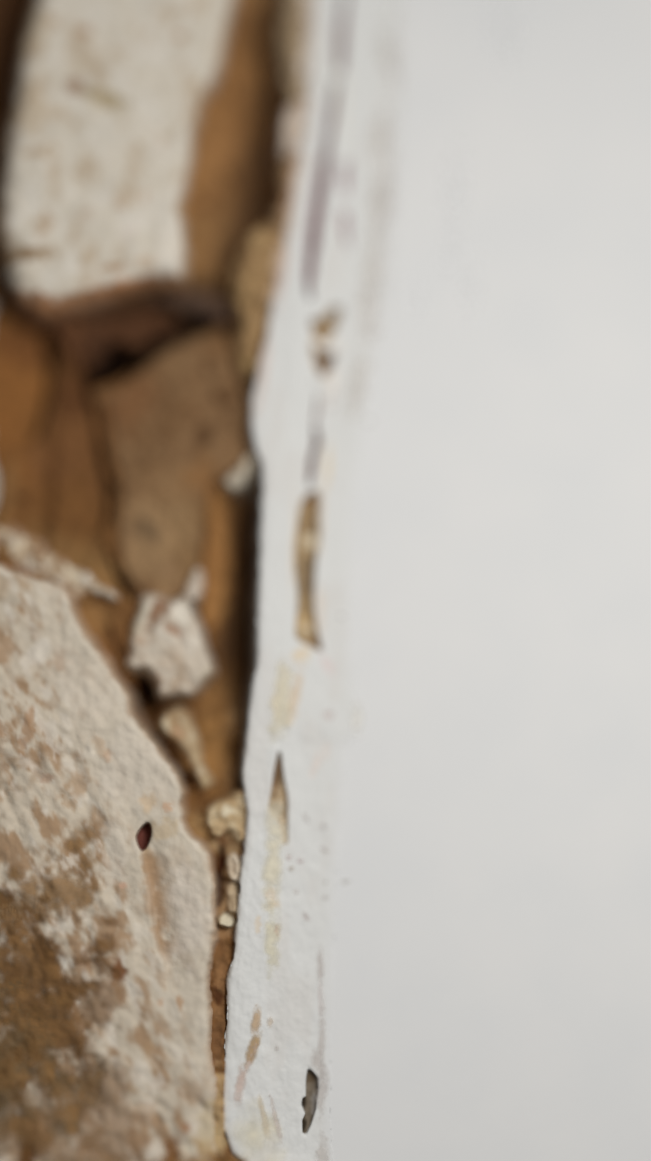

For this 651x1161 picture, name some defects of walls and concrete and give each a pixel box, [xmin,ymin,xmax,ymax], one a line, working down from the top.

crack [305,0,346,300]
crack [85,360,142,395]
peeling [0,0,412,1161]
crack [142,708,195,788]